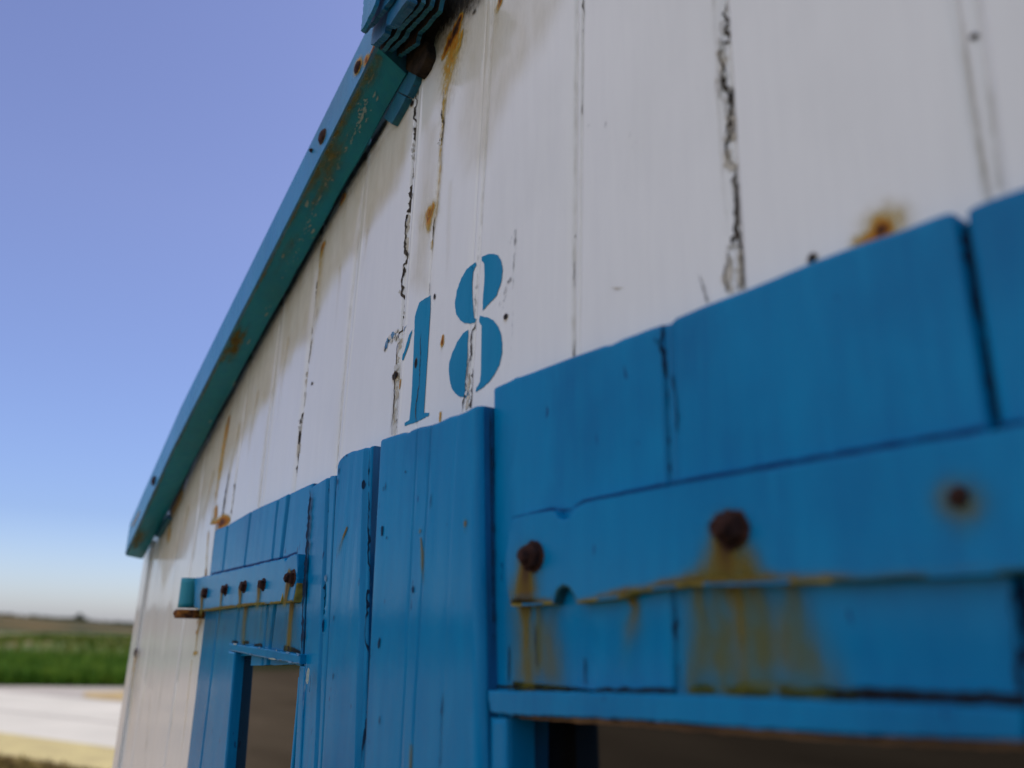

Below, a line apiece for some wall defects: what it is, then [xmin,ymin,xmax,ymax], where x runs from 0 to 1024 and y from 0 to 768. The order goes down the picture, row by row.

rust [438,12,464,183]
crack [699,3,744,301]
rust [199,46,375,400]
crack [391,91,444,431]
rust [425,202,435,247]
rust [854,211,901,246]
rust [130,420,189,549]
rust [205,506,230,576]
rust [190,569,294,674]
rust [510,563,553,689]
rust [595,535,846,616]